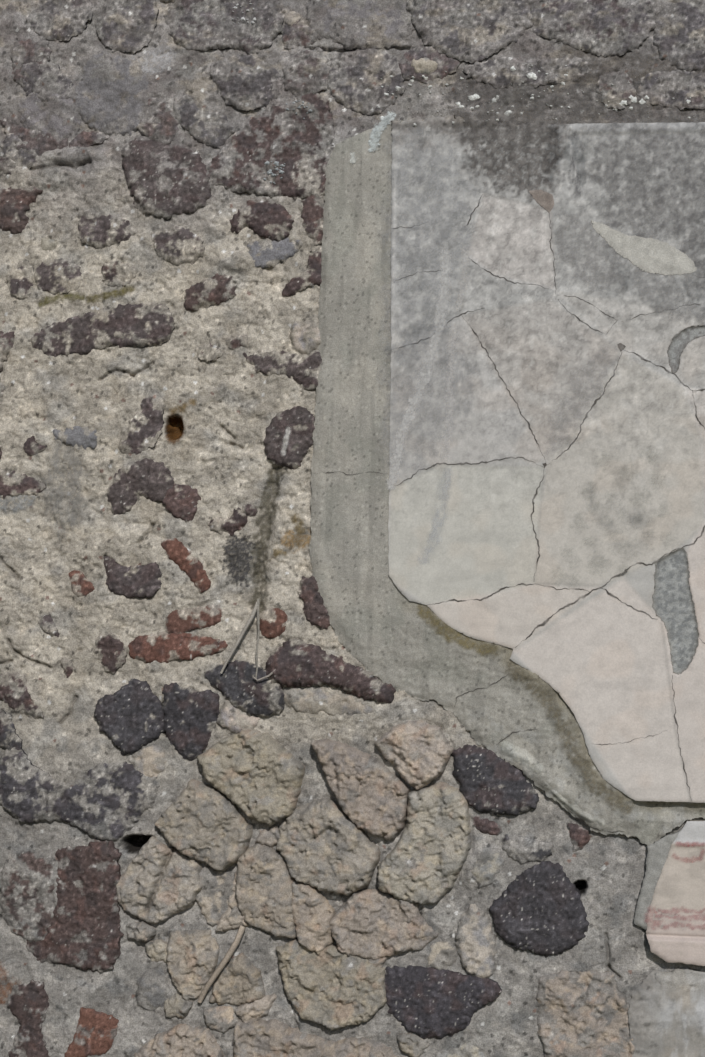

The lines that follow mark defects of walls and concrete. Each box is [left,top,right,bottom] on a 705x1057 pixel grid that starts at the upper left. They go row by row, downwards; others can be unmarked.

crack [323,213,705,647]
spalling [652,548,699,675]
crack [599,675,692,801]